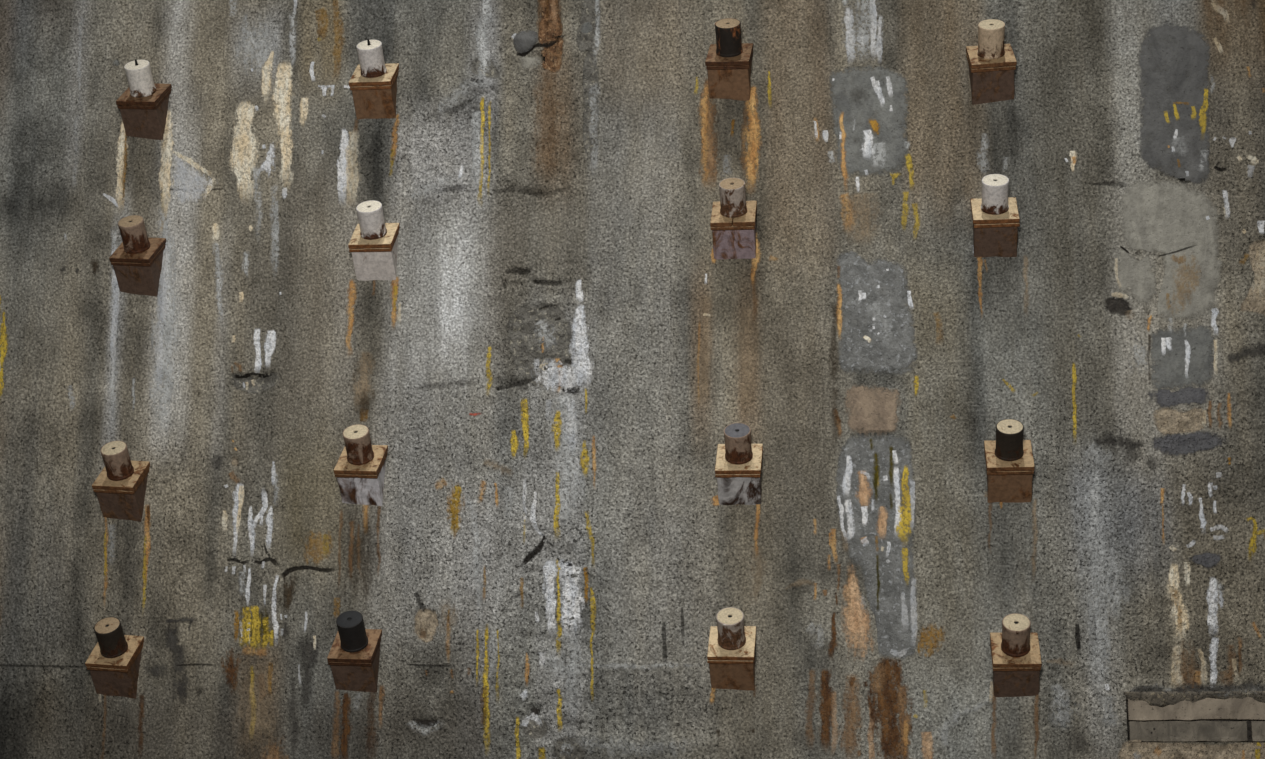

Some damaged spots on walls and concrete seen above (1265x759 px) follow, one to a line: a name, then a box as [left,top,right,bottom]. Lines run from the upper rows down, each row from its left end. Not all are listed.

water stain [309,62,350,96]
water stain [230,0,308,263]
water stain [337,130,359,198]
spalling [230,363,279,394]
spalling [508,303,578,393]
water stain [222,462,278,551]
water stain [225,562,288,647]
crack [228,544,332,609]
rust [814,529,872,657]
water stain [1167,457,1231,637]
water stain [1206,578,1224,684]
rust [819,659,912,759]